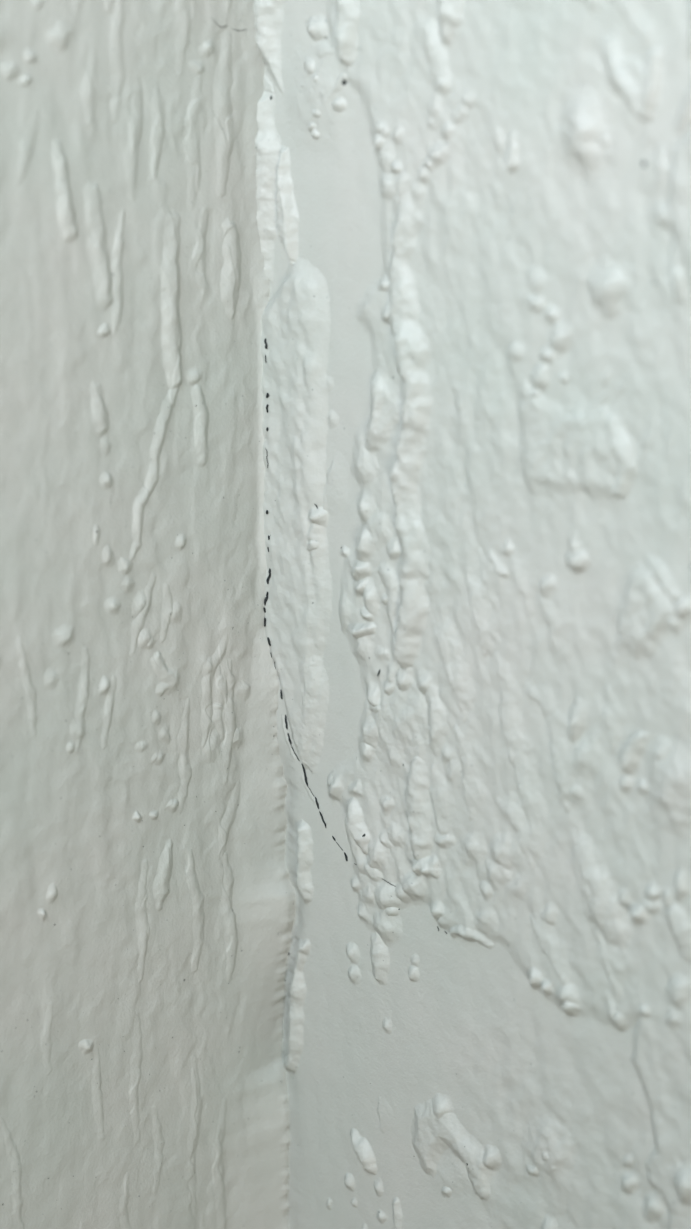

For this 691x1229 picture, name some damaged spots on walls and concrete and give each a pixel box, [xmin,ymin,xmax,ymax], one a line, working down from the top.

crack [263,510,356,865]